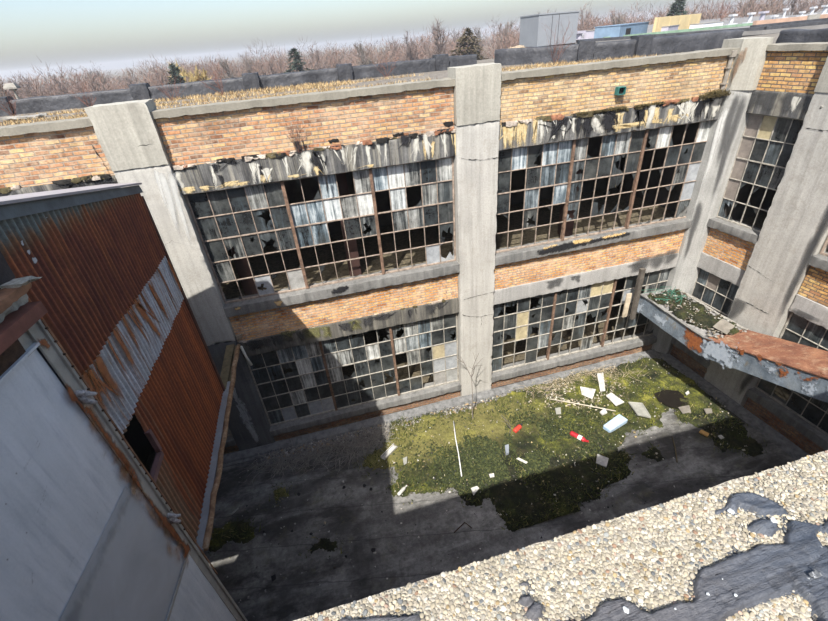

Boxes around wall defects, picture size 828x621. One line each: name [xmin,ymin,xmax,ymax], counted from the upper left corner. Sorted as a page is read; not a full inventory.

leakage [282,140,387,192]
leakage [399,133,456,161]
leakage [499,92,812,185]
leakage [155,159,273,236]
corrosion [157,261,182,300]
corrosion [107,282,169,371]
corrosion [683,327,703,353]
peeling [700,339,738,369]
corrosion [776,363,824,381]
corrosion [38,320,218,575]
peeling [726,590,817,621]